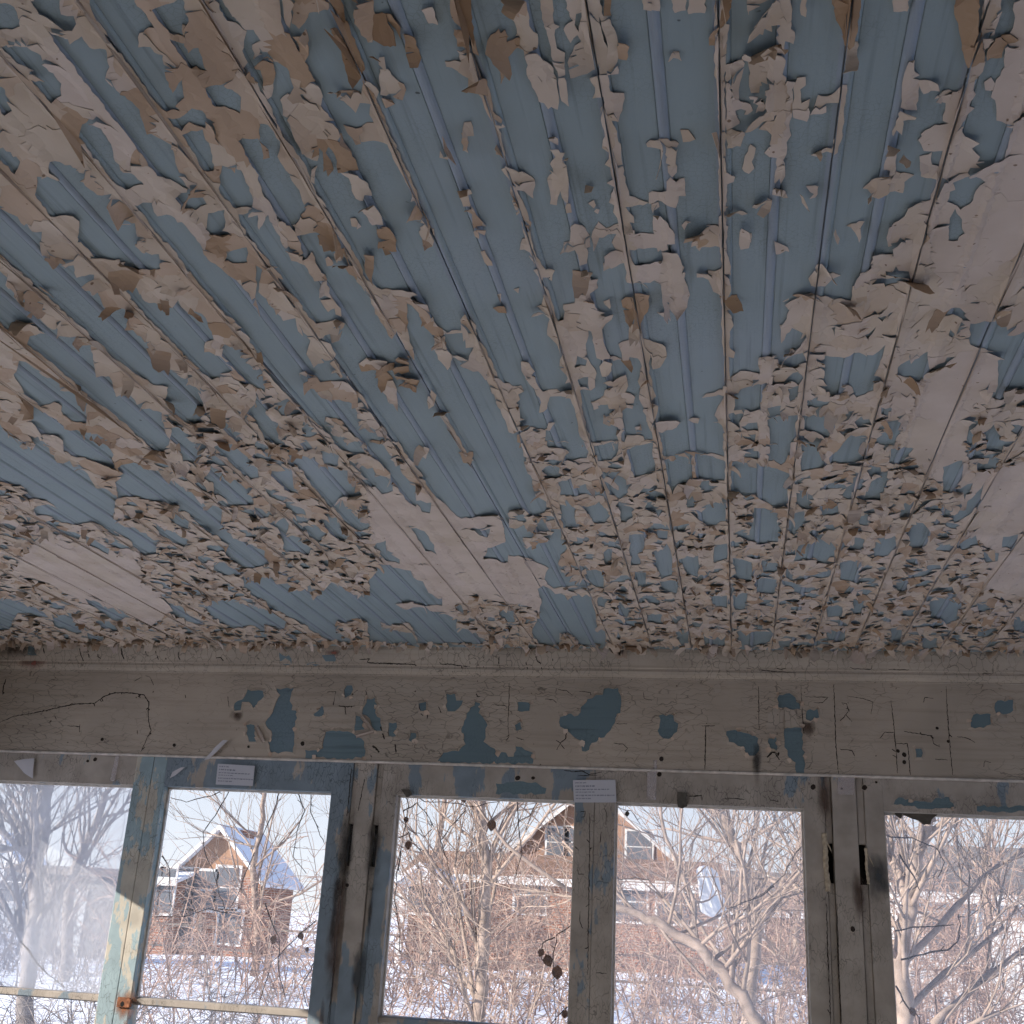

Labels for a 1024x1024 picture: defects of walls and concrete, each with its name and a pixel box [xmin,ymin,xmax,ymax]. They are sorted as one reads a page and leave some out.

peeling [0,0,1024,669]
crack [1,648,180,751]
peeling [231,683,419,760]
peeling [437,689,537,765]
peeling [556,684,625,754]
peeling [655,710,682,742]
peeling [723,690,822,773]
crack [748,667,991,775]
peeling [966,696,1016,732]
peeling [891,794,957,813]
peeling [974,802,1024,816]